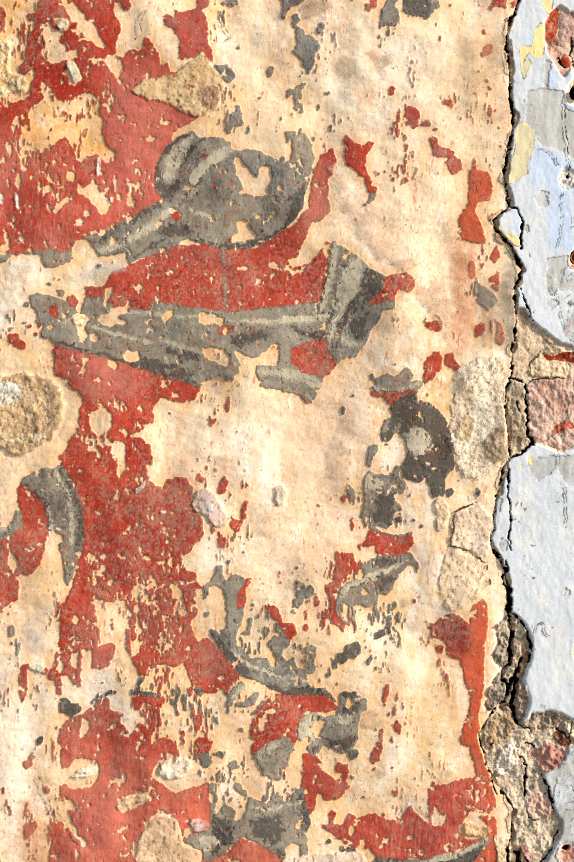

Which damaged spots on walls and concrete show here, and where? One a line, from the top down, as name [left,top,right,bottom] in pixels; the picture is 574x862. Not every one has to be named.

peeling [163,0,225,61]
peeling [0,0,199,255]
peeling [67,144,337,325]
peeling [1,333,26,349]
peeling [290,339,337,378]
peeling [323,0,574,862]
crack [450,0,574,862]
peeling [0,344,253,862]
peeling [262,517,415,645]
peeling [240,693,339,755]
peeling [301,753,355,813]
peeling [202,837,284,862]